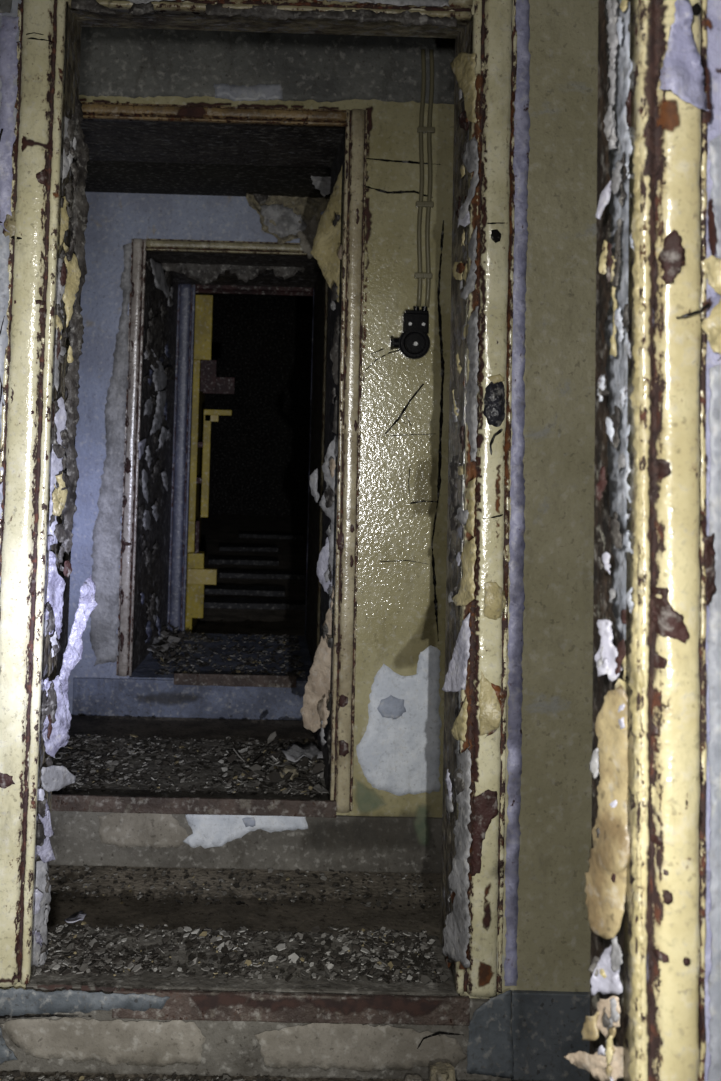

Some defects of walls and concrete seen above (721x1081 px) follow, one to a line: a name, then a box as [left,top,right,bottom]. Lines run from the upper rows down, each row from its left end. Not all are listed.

peeling [0,0,22,440]
rust [35,300,48,325]
rust [462,74,499,908]
rust [495,91,515,538]
peeling [504,0,531,986]
peeling [563,0,645,1081]
rust [642,0,690,1067]
peeling [659,0,710,111]
peeling [676,134,721,1081]
rust [700,514,717,606]
rust [707,199,718,256]
spalling [0,987,206,1067]